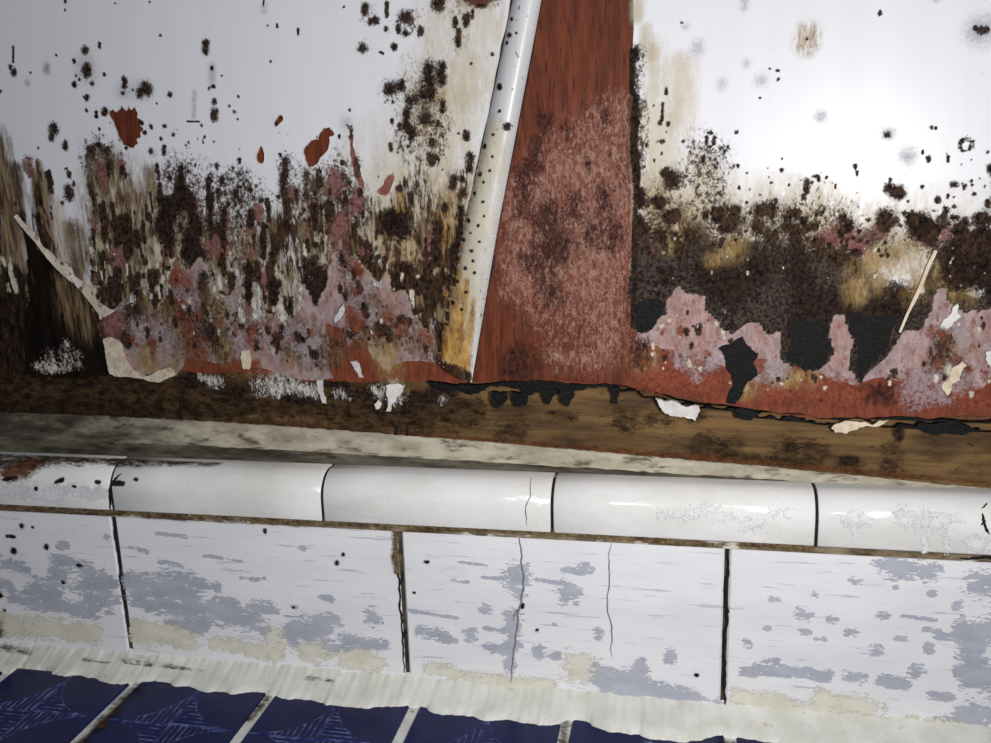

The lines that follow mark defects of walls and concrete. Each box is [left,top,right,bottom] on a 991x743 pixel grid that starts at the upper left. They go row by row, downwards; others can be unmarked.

leakage [0,0,991,484]
peeling [940,303,961,331]
peeling [316,379,327,404]
peeling [350,361,364,378]
peeling [374,383,404,412]
peeling [941,361,966,395]
crack [960,502,991,560]
peeling [0,539,390,656]
peeling [406,558,595,674]
crack [510,479,532,683]
peeling [737,567,991,727]
peeling [588,657,724,704]